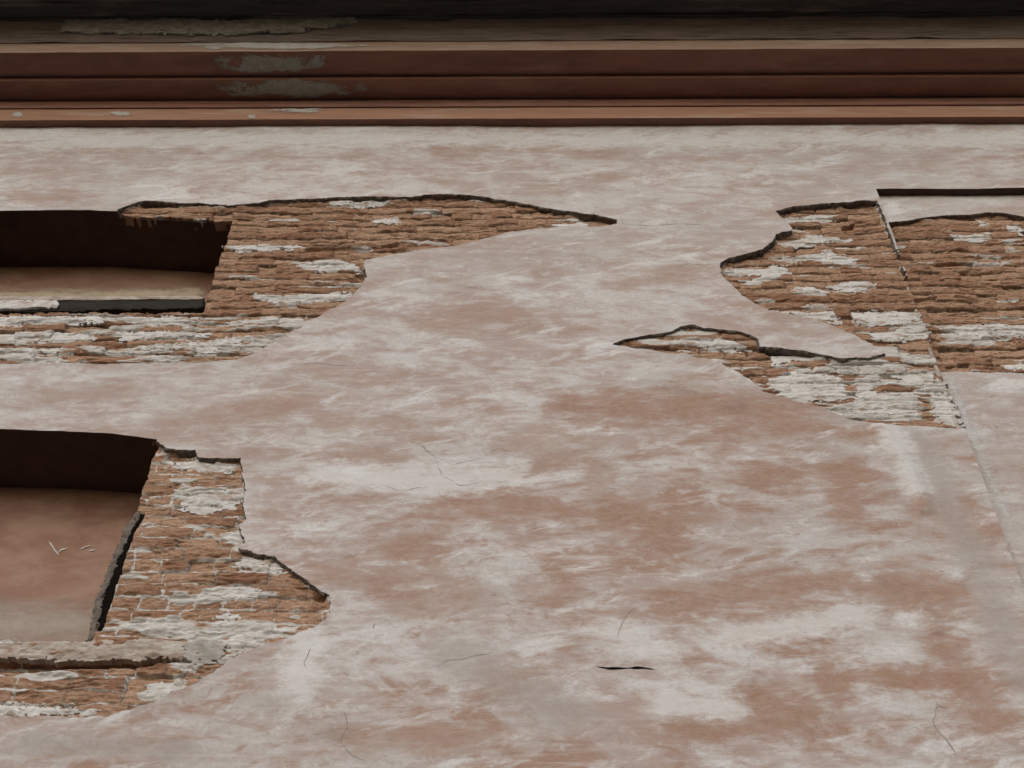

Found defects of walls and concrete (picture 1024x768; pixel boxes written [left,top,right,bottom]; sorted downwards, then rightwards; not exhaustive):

flaking render [0,194,617,364]
flaking render [613,200,1024,428]
flaking render [0,441,331,718]
crack [597,663,652,671]